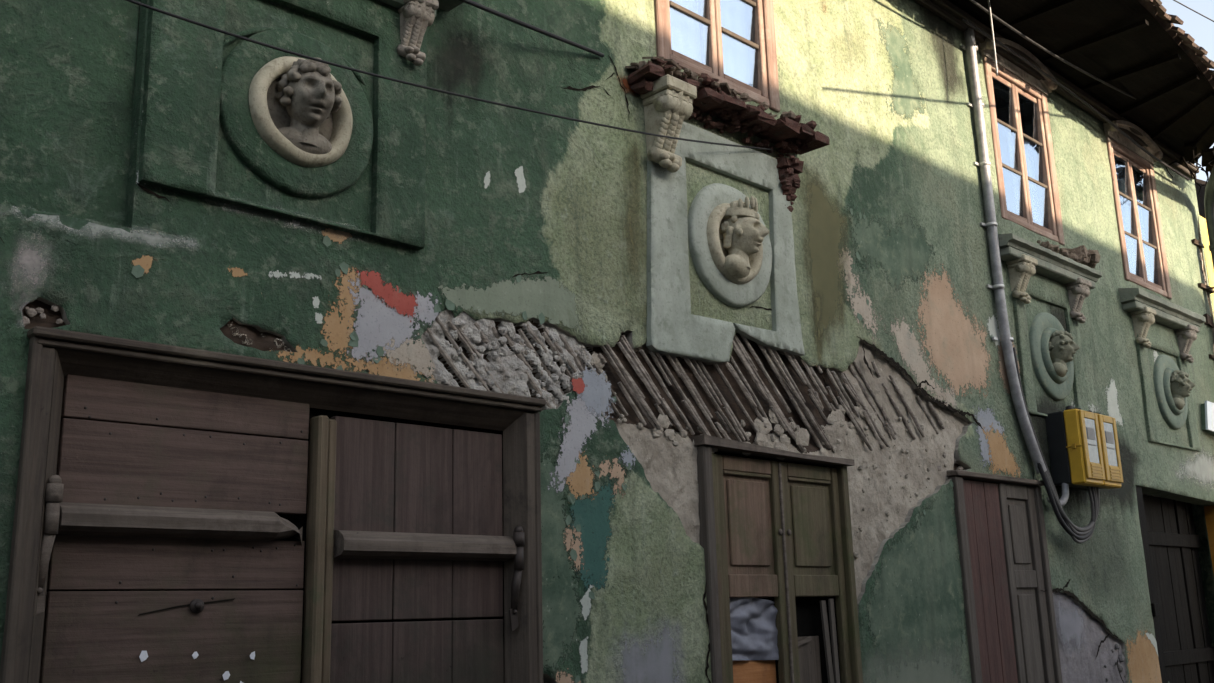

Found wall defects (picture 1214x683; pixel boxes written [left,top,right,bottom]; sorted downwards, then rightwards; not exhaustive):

flaking render [22,300,66,329]
flaking render [220,201,1021,683]
flaking render [1053,592,1169,683]